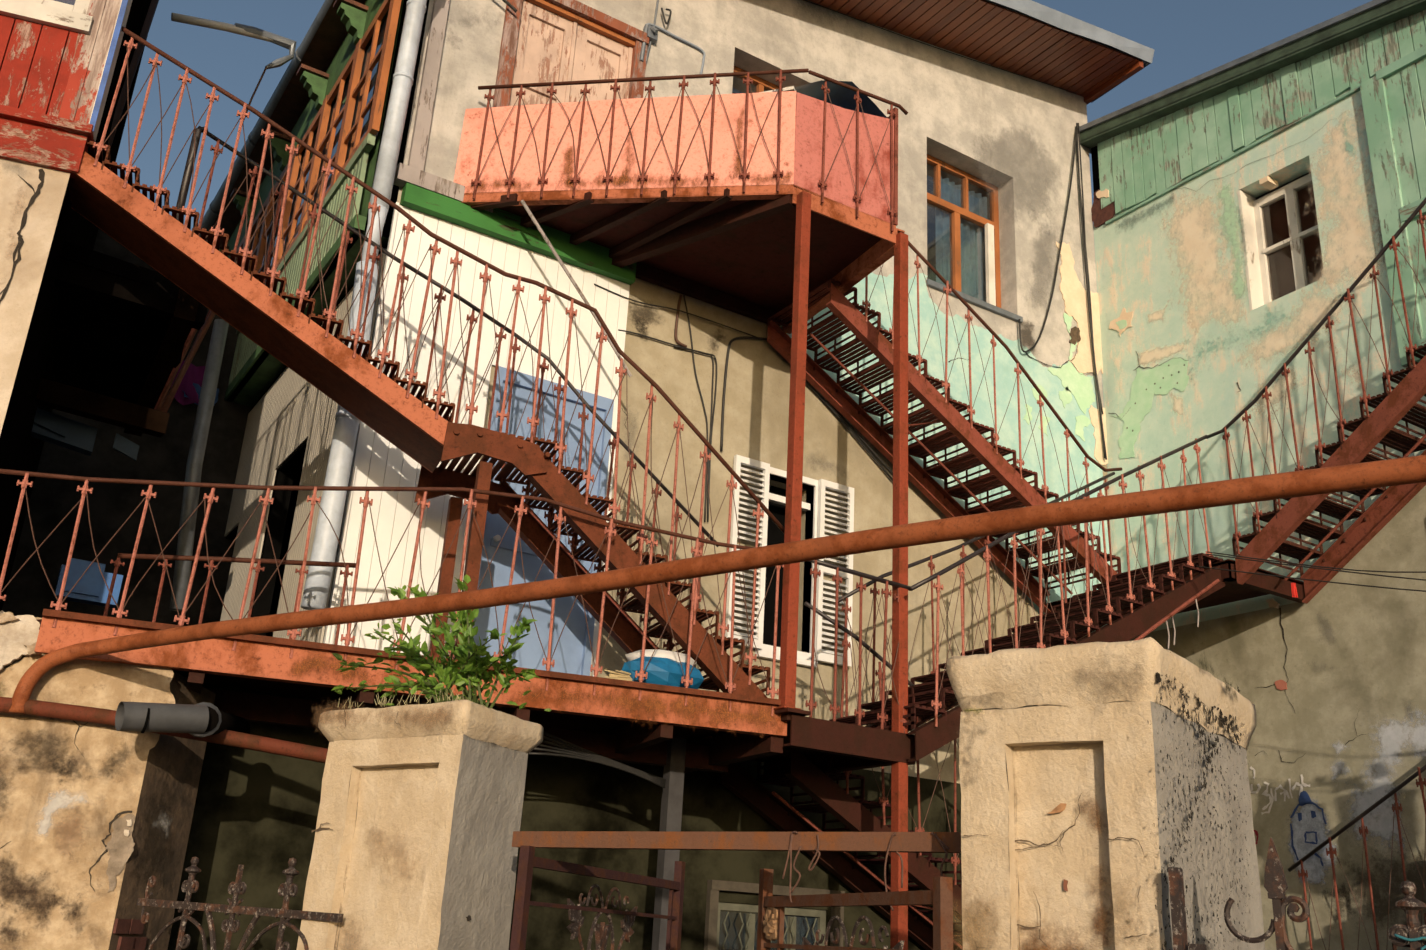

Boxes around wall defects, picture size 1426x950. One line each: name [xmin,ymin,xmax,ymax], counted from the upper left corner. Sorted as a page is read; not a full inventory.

rust [471,182,529,190]
rust [564,141,716,188]
rust [736,111,790,184]
crack [0,169,45,302]
peeling [845,114,1381,502]
peeling [786,307,1011,509]
flaking render [0,611,46,672]
damp [38,791,84,848]
crack [964,793,1082,850]
damp [0,860,80,921]
crack [1107,837,1147,938]
damp [1,927,18,941]